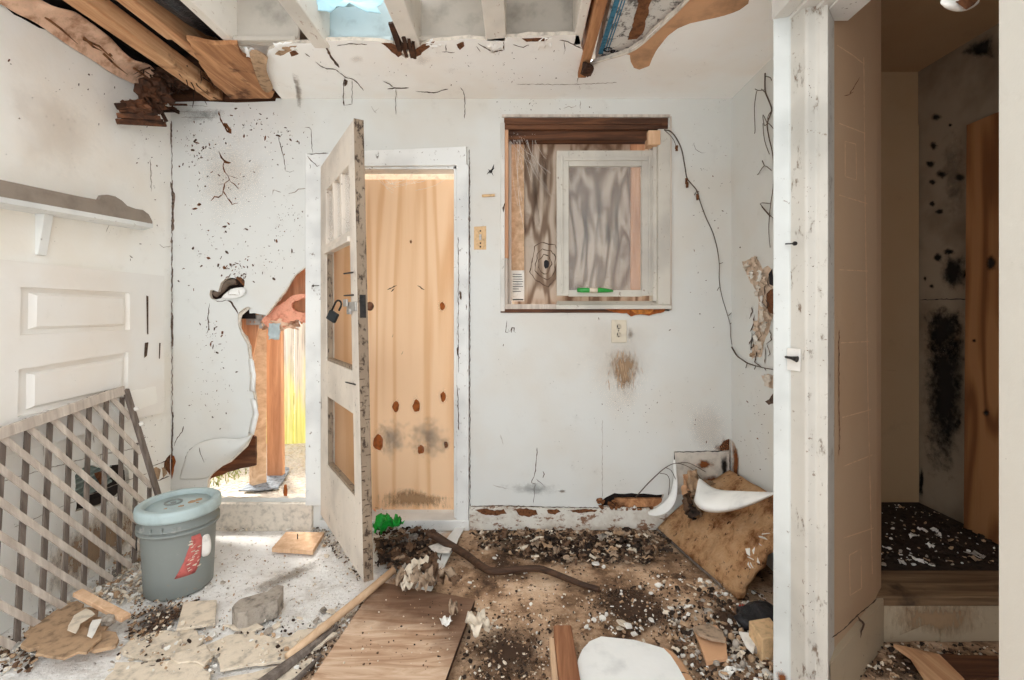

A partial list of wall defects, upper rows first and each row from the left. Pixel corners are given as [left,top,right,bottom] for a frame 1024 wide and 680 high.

crack [305,43,465,118]
peeling [382,39,442,76]
crack [520,78,617,109]
leakage [926,142,964,197]
leakage [934,249,966,286]
crack [5,105,238,527]
peeling [738,256,773,446]
leakage [927,311,964,457]
spalling [476,493,662,517]